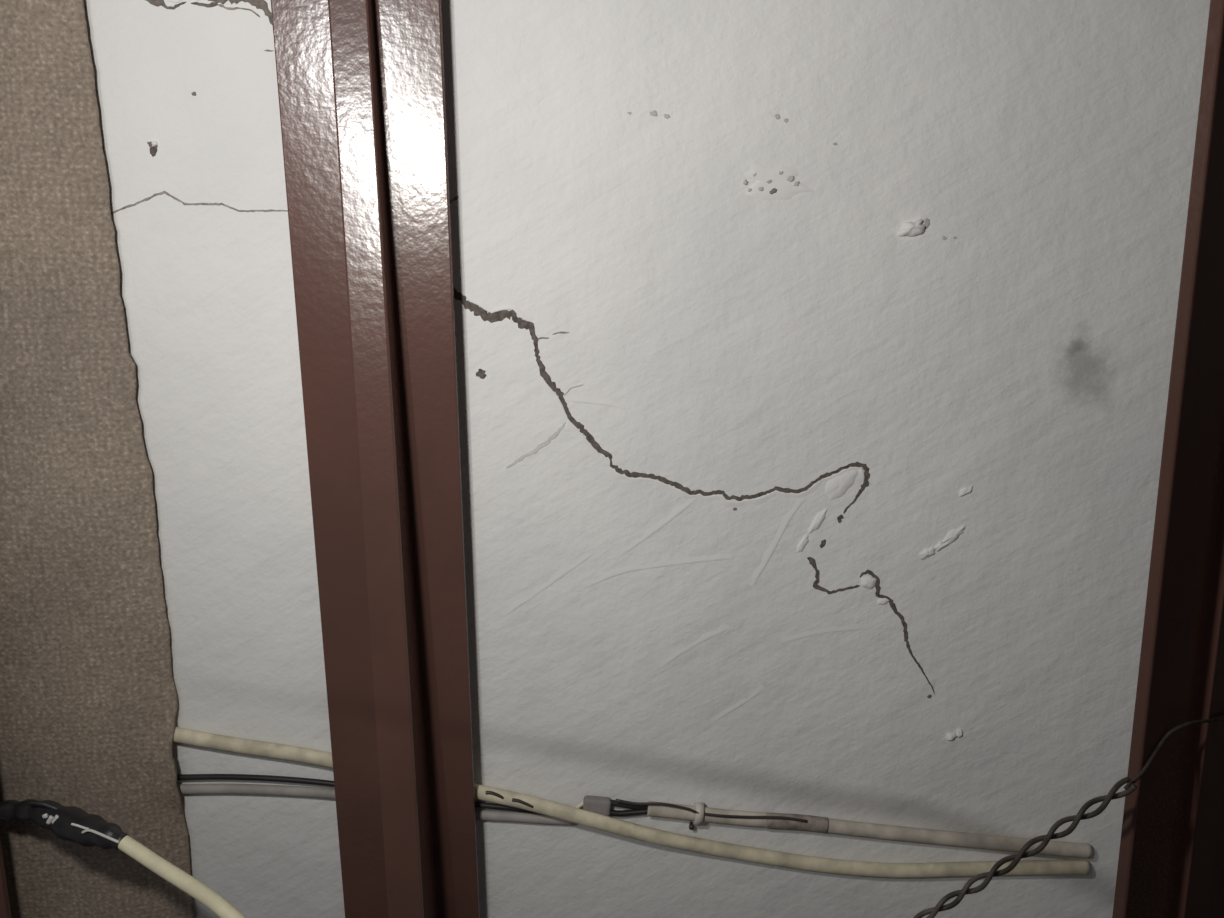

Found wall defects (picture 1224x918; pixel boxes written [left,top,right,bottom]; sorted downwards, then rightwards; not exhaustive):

crack [146,0,274,52]
crack [111,191,288,215]
crack [453,287,935,694]